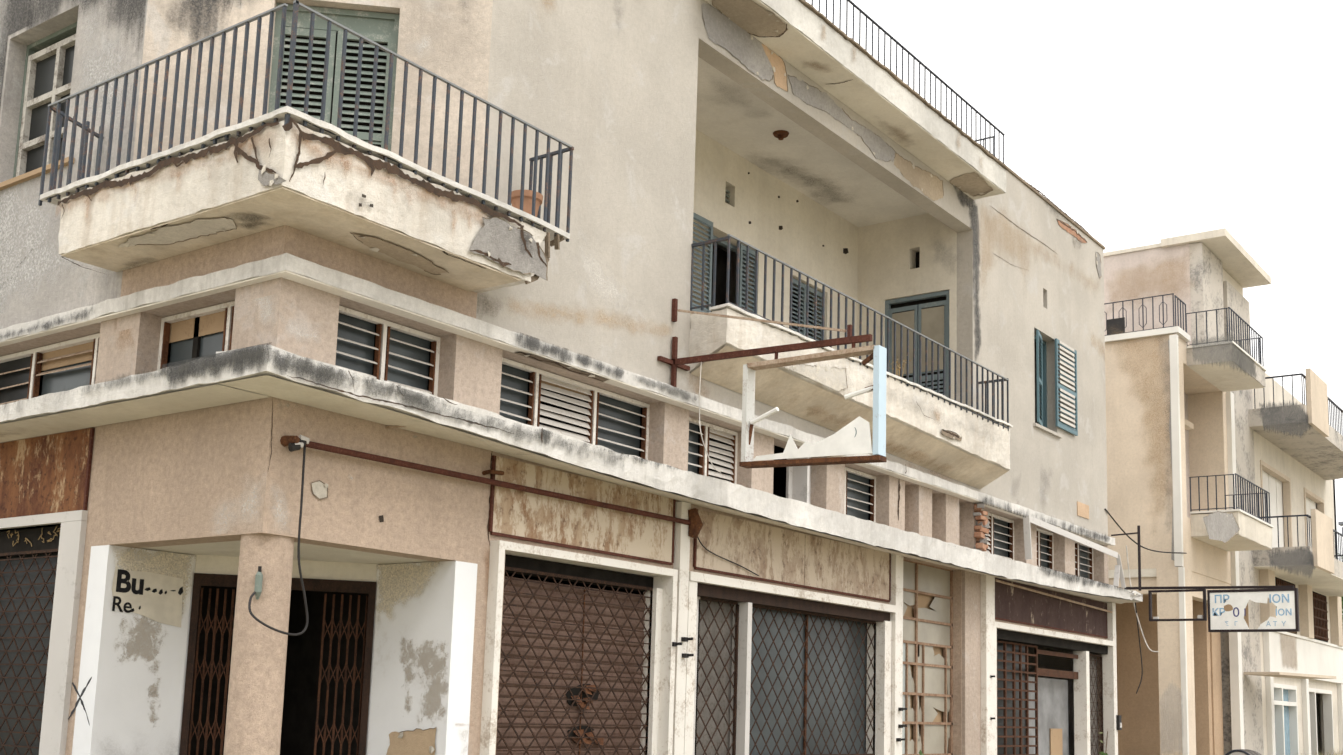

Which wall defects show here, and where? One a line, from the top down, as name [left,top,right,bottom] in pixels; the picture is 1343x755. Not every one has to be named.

leakage [172,0,230,39]
peeling [701,0,993,201]
spalling [469,217,548,281]
rust [280,435,691,525]
peeling [117,617,161,723]
peeling [386,639,448,755]